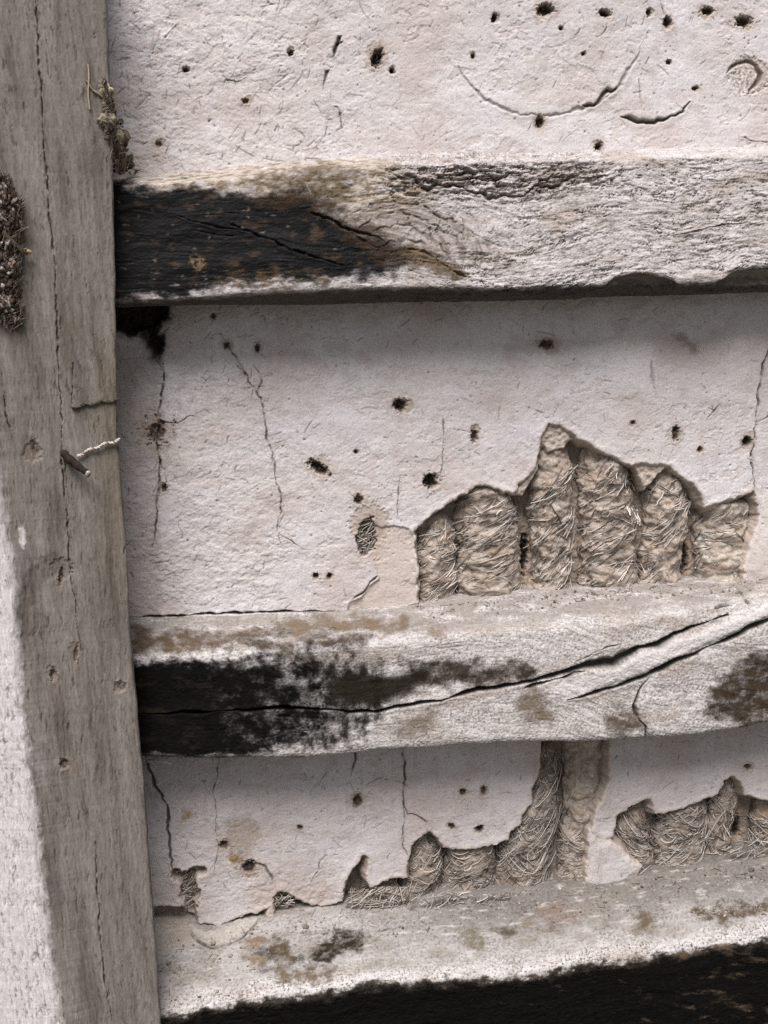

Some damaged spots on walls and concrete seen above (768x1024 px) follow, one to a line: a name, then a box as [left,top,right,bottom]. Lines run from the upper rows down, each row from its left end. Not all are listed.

damp [113,166,466,302]
crack [218,332,308,550]
spalling [344,423,760,610]
crack [131,575,378,618]
damp [131,614,553,758]
crack [323,587,768,737]
damp [704,651,768,726]
spalling [153,865,244,926]
crack [145,756,261,963]
spalling [262,814,523,916]
spalling [581,740,691,884]
spalling [705,776,768,862]